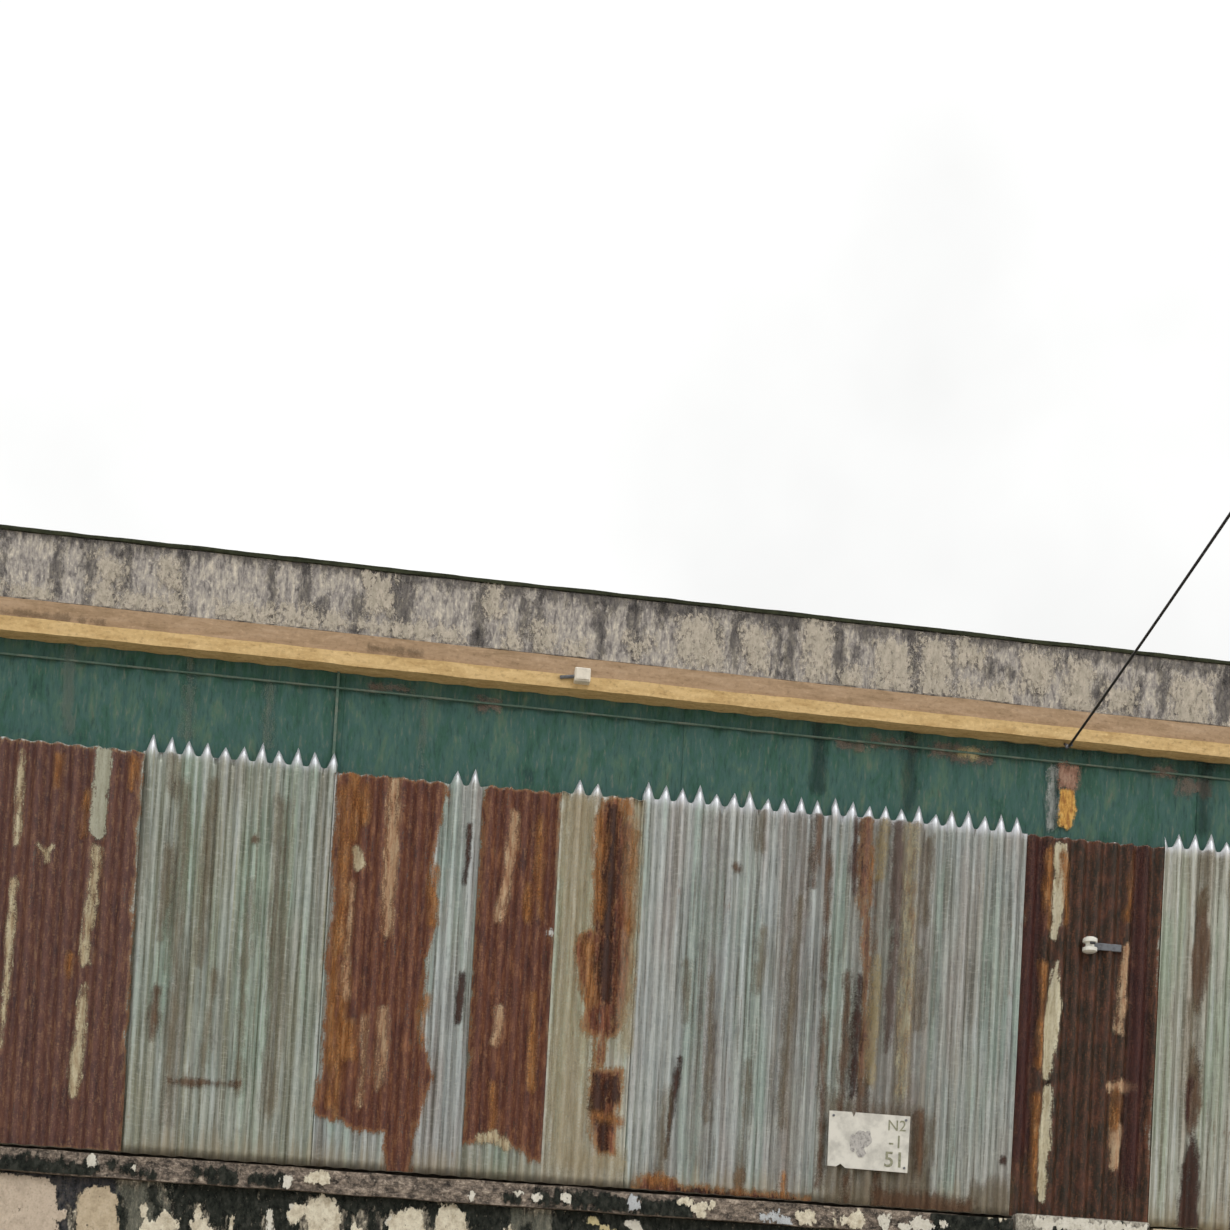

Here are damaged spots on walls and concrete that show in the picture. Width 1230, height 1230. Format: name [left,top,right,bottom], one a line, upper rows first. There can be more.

rust [0,736,145,1151]
rust [312,772,450,1172]
rust [454,785,562,1163]
rust [573,796,642,1157]
rust [999,762,1165,1222]
peeling [0,1172,120,1230]
peeling [139,1202,213,1230]
peeling [266,1169,363,1230]
peeling [385,1191,475,1230]
spalling [586,1193,643,1230]
spalling [832,1208,948,1230]
spalling [1033,1216,1149,1230]